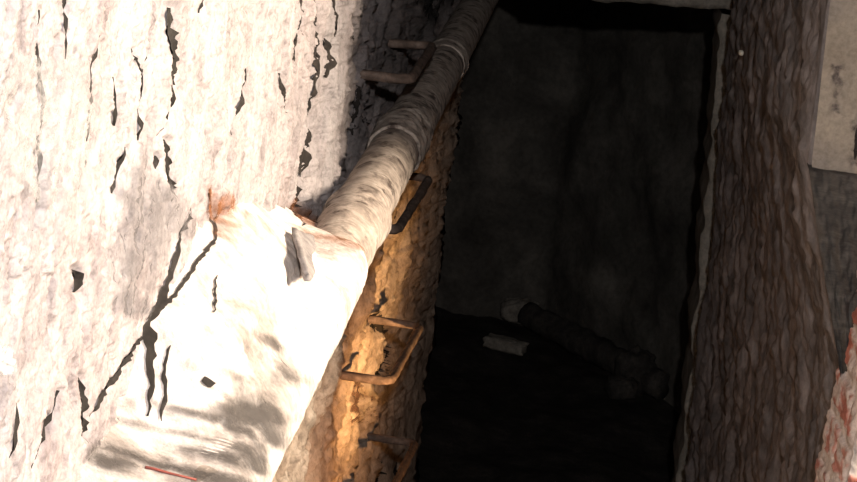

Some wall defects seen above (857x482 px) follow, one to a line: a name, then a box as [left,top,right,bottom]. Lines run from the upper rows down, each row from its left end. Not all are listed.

crack [89,189,224,421]
flaking render [291,227,316,281]